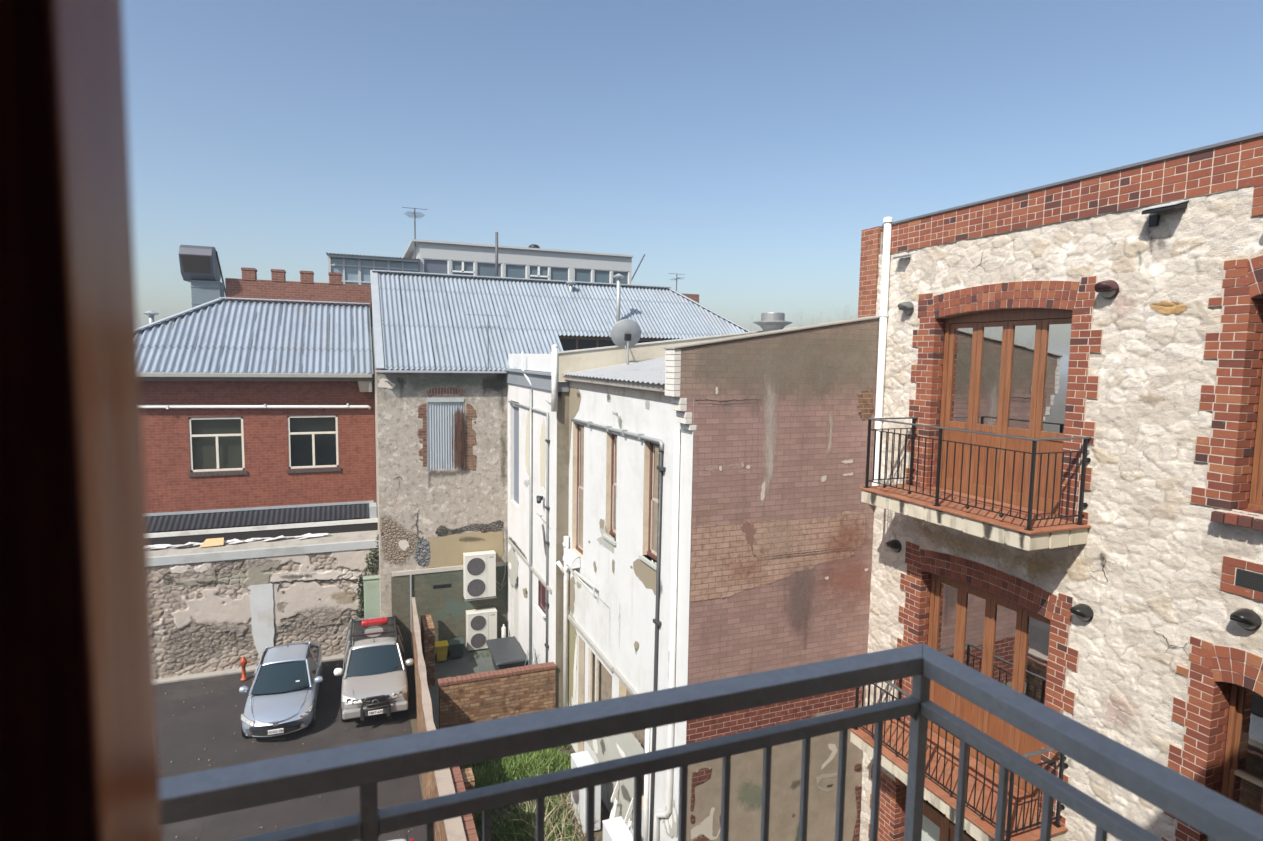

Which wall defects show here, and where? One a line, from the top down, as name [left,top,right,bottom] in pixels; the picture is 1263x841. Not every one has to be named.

flaking render [380,517,504,566]
flaking render [165,564,208,583]